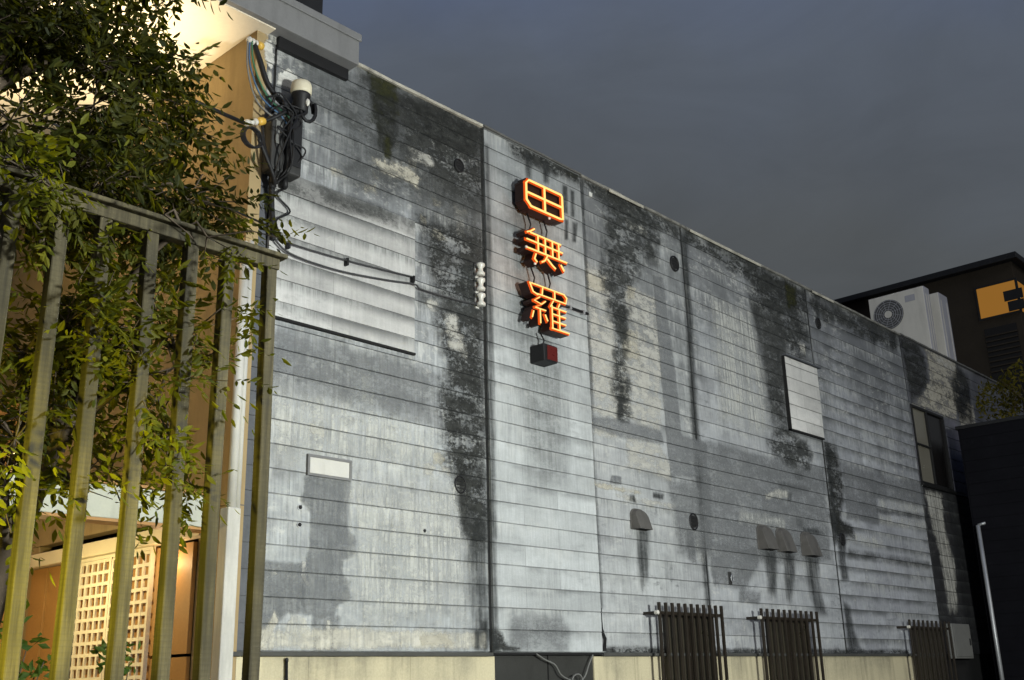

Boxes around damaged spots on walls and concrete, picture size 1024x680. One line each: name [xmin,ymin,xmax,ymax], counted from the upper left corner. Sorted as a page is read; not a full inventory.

leakage [262,91,566,652]
leakage [508,141,972,612]